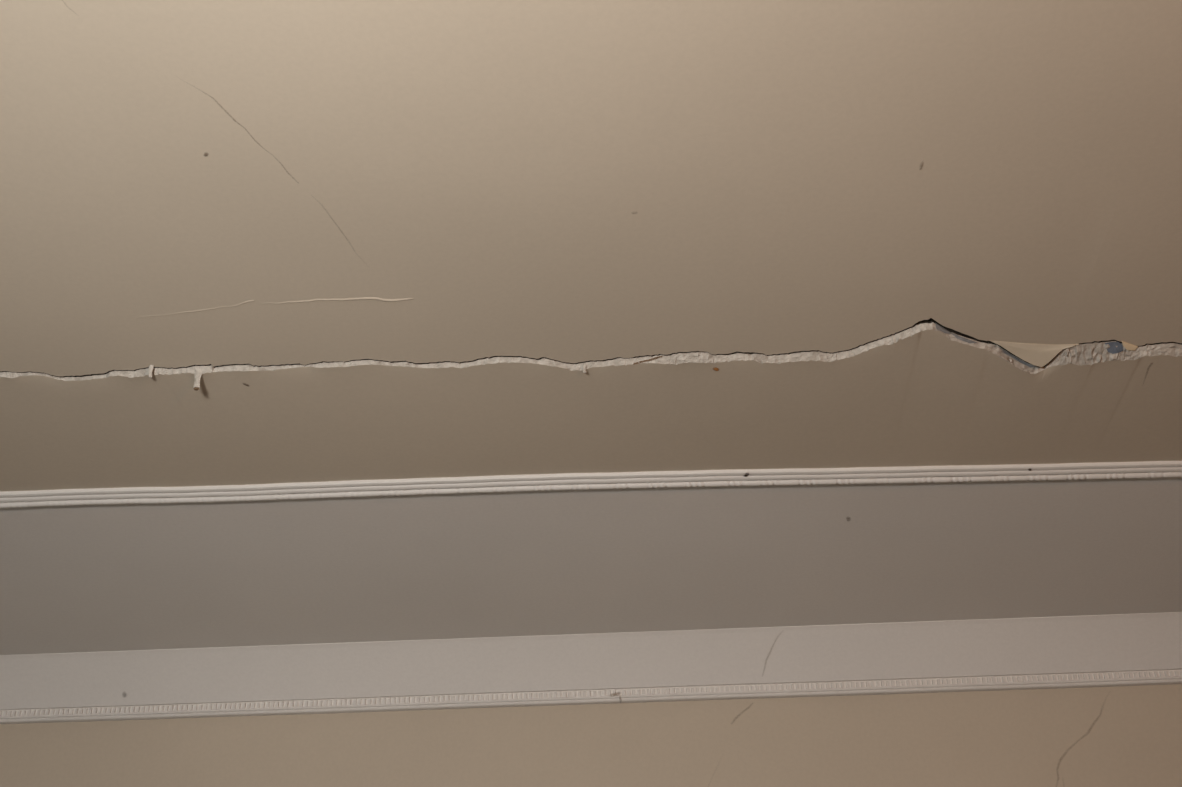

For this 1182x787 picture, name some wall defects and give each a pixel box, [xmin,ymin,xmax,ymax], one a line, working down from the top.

crack [0,318,1182,391]
peeling [989,340,1079,367]